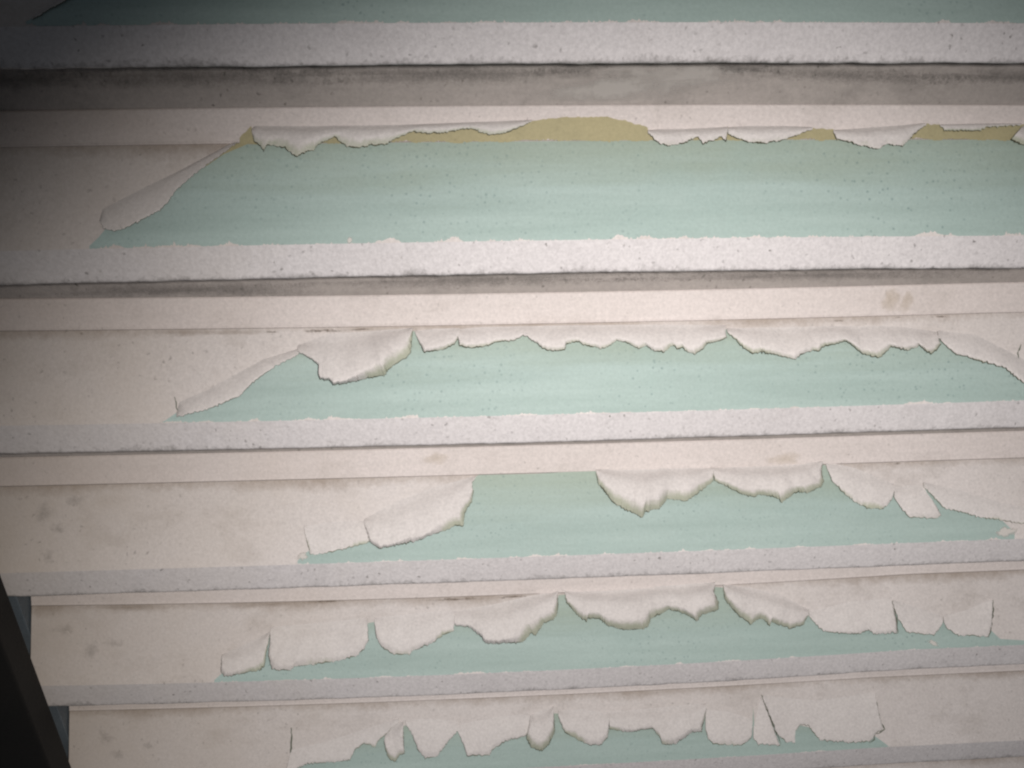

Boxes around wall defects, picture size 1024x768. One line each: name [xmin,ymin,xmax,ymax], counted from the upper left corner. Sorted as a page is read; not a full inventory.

peeling [89,117,1024,249]
peeling [163,325,1024,423]
peeling [297,461,1024,564]
peeling [214,582,1024,682]
peeling [287,692,889,768]